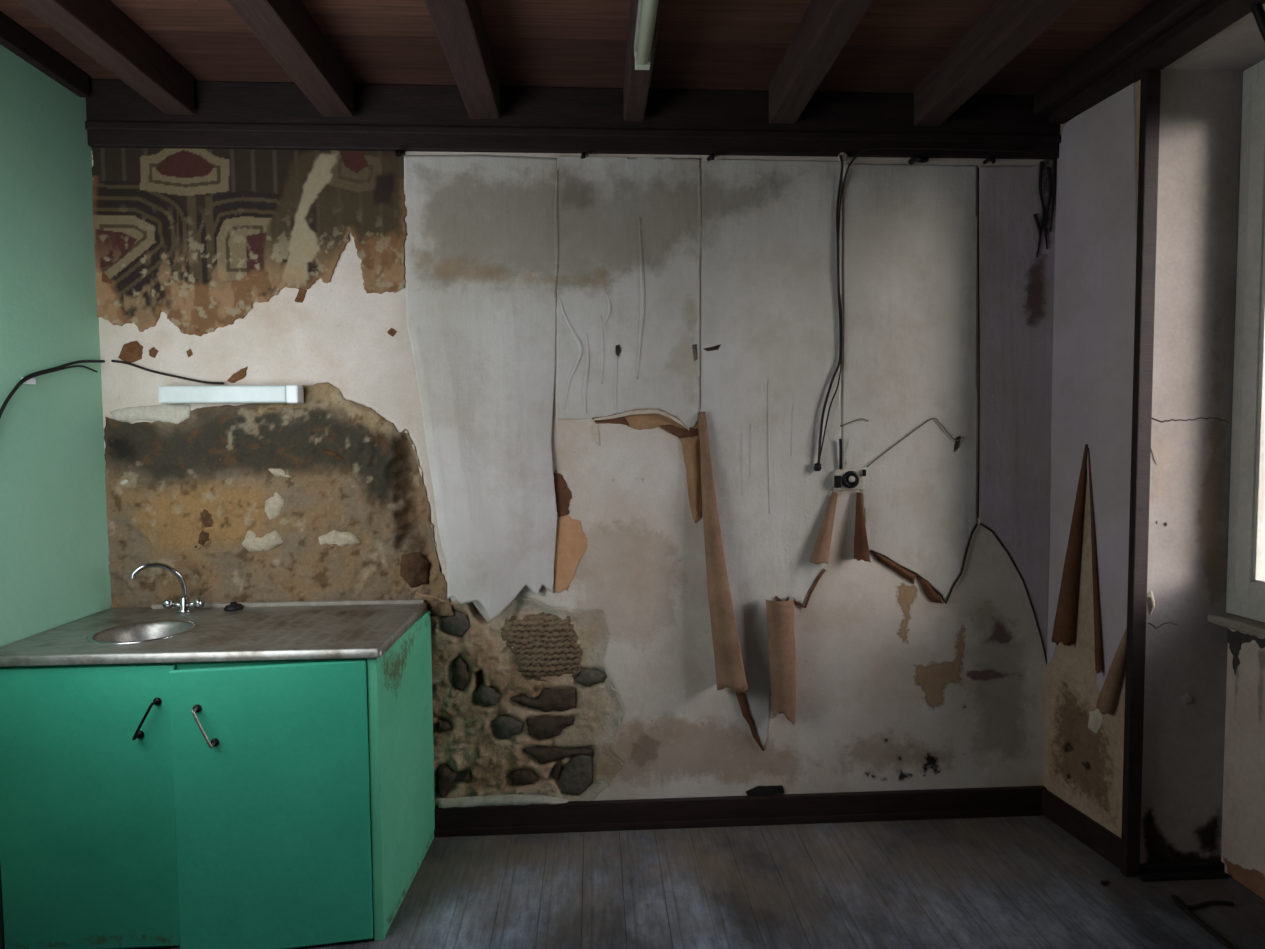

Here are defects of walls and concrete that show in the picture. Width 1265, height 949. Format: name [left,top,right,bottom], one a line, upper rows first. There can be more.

spalling [104,382,625,808]
damp [898,753,940,780]
damp [1143,809,1221,864]
peeling [1223,857,1265,900]